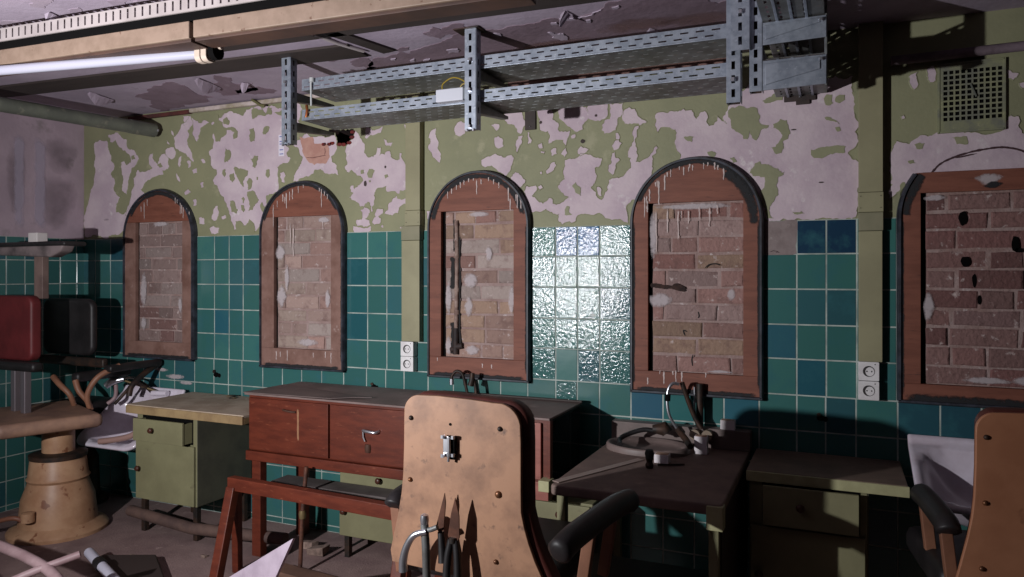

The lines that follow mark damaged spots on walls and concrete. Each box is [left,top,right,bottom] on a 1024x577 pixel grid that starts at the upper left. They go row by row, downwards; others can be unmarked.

peeling [350,23,465,83]
peeling [478,0,726,70]
leakage [130,191,184,216]
peeling [84,75,405,239]
leakage [264,183,336,220]
peeling [427,128,442,163]
leakage [431,174,524,219]
peeling [481,75,858,255]
peeling [887,114,1024,199]
leakage [434,231,526,380]
leakage [633,160,759,397]
leakage [265,339,341,370]